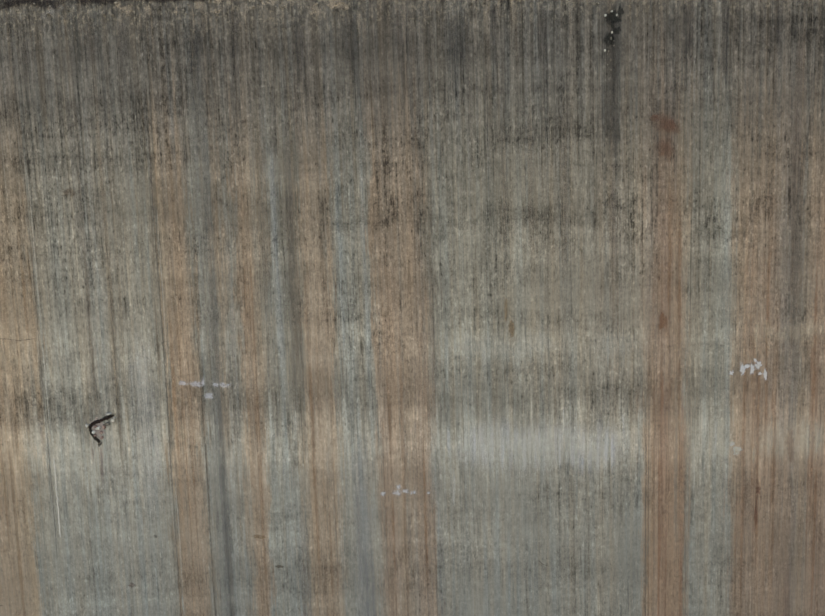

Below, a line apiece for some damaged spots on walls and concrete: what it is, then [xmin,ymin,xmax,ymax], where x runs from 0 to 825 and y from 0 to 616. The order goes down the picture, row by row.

water stain [604,6,623,44]
spalling [85,413,116,447]